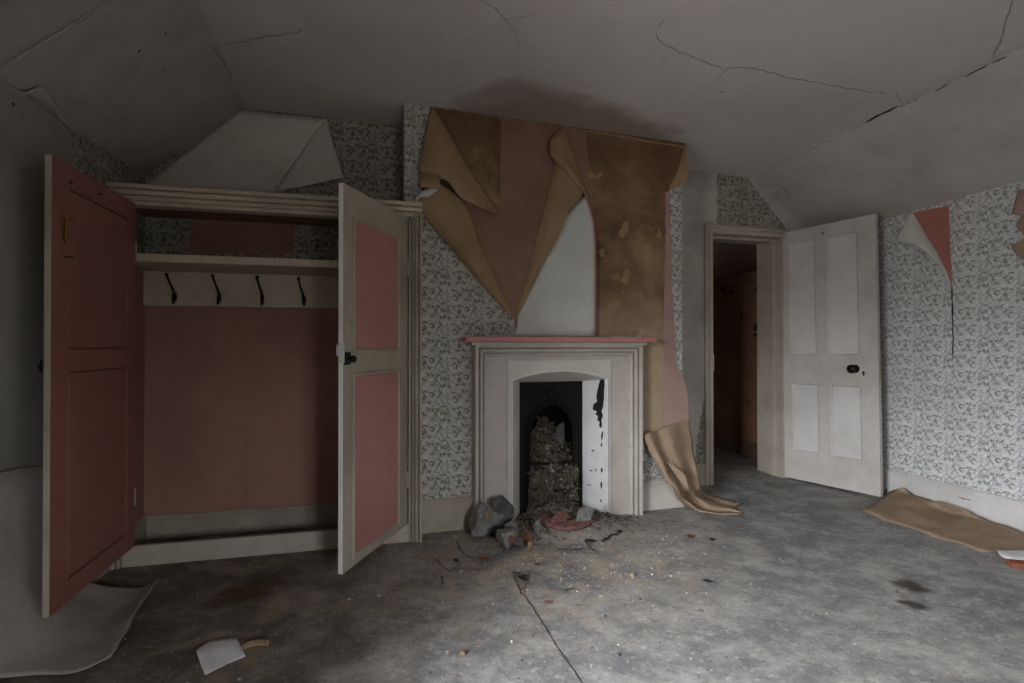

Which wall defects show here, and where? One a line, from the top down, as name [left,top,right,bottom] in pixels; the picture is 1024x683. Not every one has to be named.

crack [656,20,902,104]
flaking render [682,170,718,457]
spalling [591,379,605,451]
spalling [540,468,603,531]
crack [513,575,582,683]